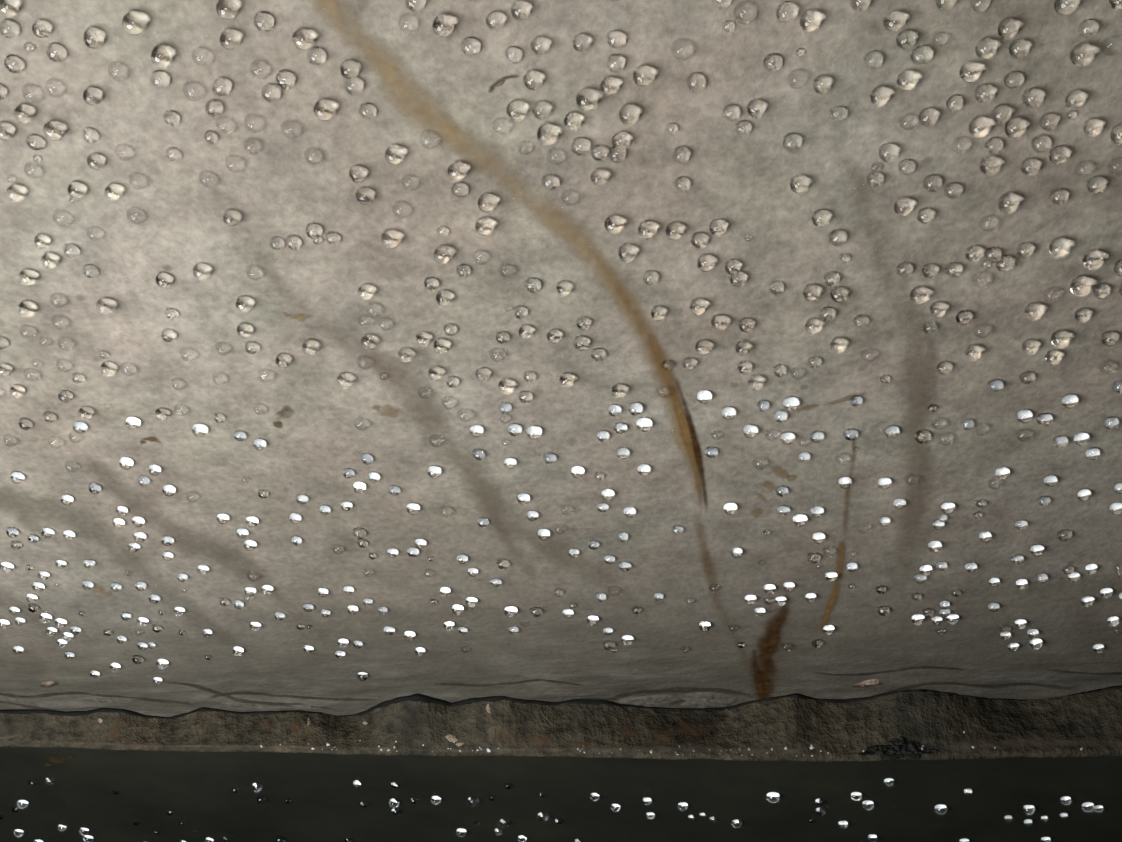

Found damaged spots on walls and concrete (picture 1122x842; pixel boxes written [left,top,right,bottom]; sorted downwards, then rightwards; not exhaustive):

rust [536,205,706,505]
rust [822,544,844,627]
rust [753,606,787,700]